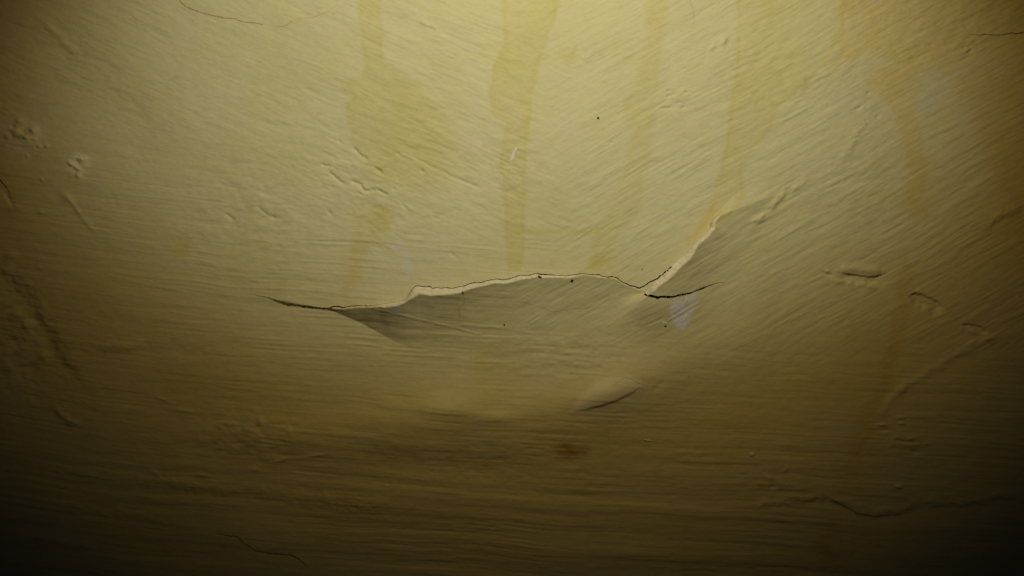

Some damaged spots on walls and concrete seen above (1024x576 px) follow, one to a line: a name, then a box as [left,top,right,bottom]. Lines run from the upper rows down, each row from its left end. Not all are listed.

crack [247,216,729,326]
leakage [487,0,673,277]